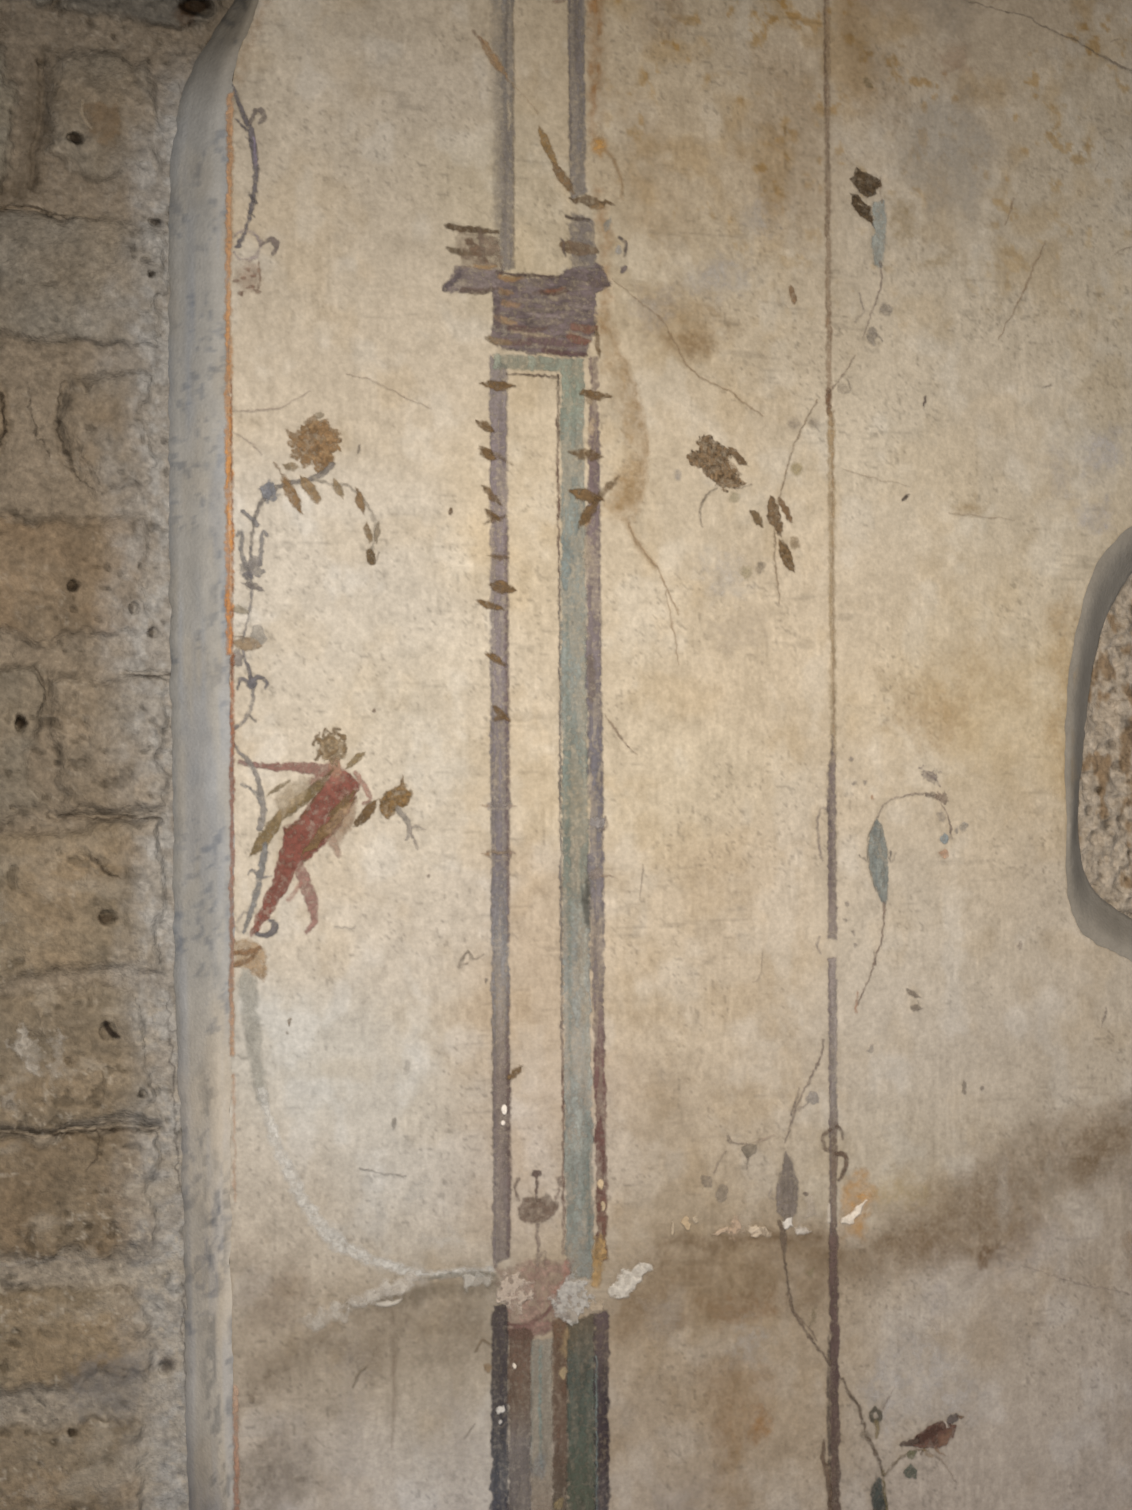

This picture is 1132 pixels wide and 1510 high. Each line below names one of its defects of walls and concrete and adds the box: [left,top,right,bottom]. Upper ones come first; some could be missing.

flaking render [312,1274,415,1329]
flaking render [496,1272,534,1314]
flaking render [552,1263,652,1325]